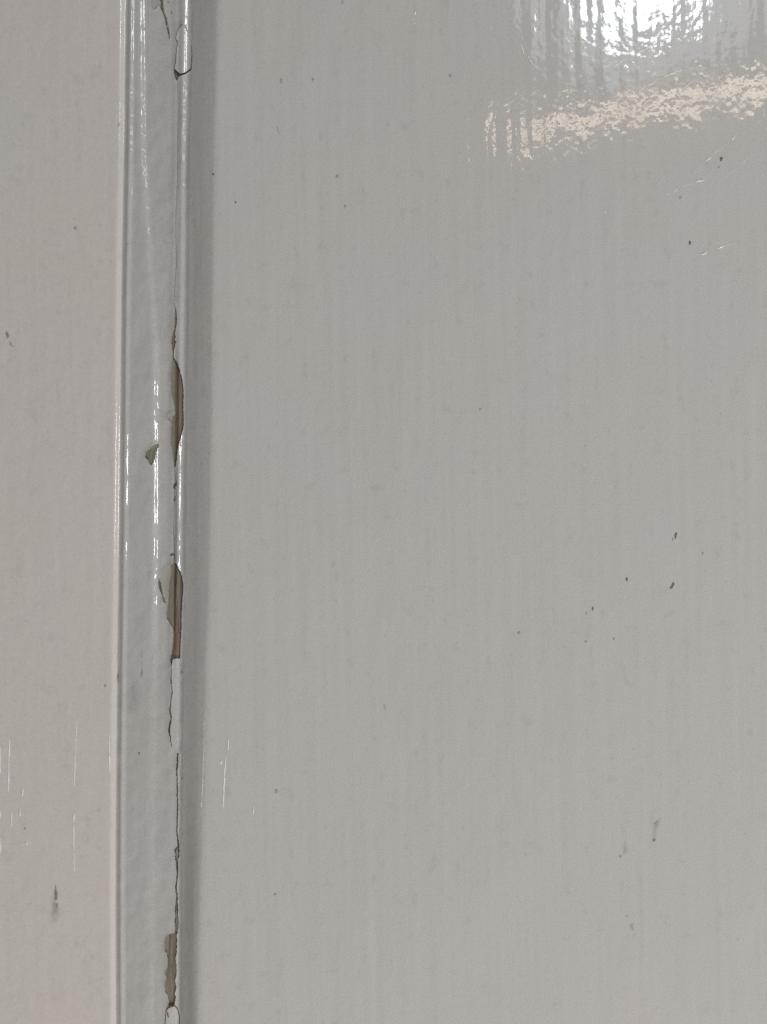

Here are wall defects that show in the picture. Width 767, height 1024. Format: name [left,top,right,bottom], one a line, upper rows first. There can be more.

peeling [150,0,193,80]
peeling [145,359,184,467]
peeling [158,563,183,664]
crack [168,665,180,934]
peeling [164,933,180,1024]